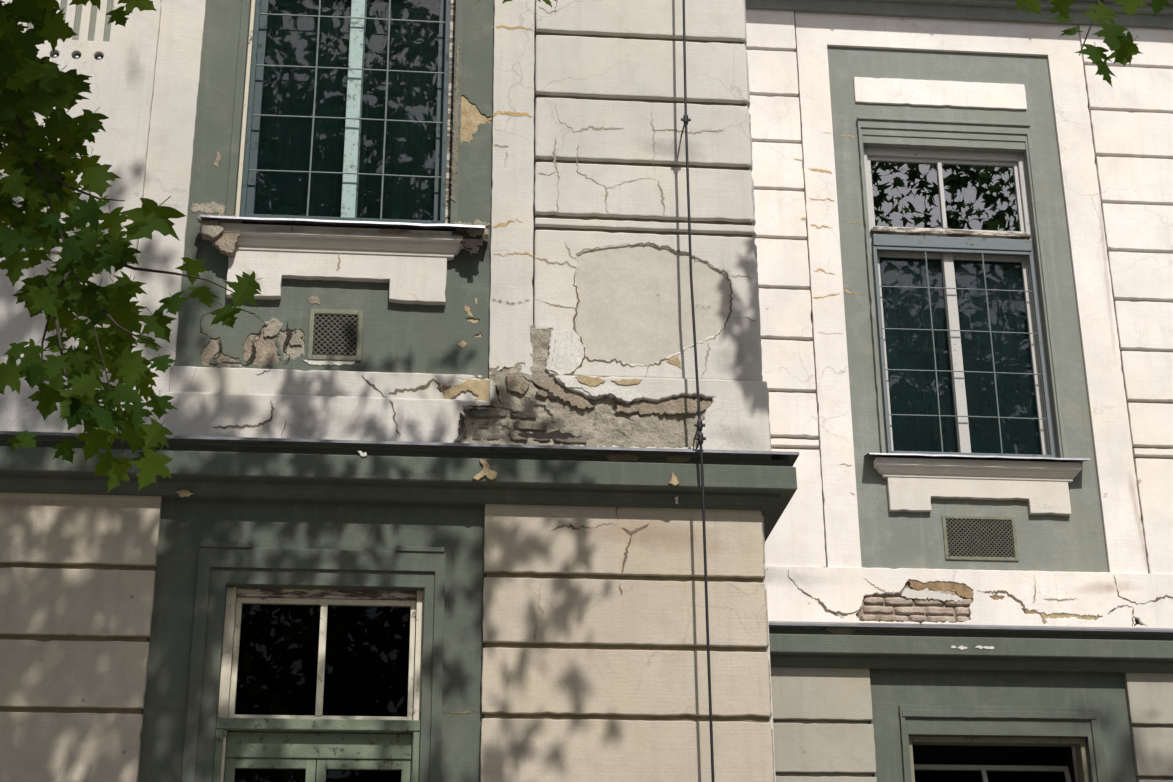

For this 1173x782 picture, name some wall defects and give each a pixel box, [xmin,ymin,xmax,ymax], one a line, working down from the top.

crack [489,104,723,217]
flaking render [190,201,243,257]
crack [493,219,757,378]
flaking render [200,318,355,368]
crack [212,401,286,438]
crack [362,375,444,437]
flaking render [438,325,712,486]
crack [553,501,649,595]
flaking render [825,580,973,635]
crack [977,575,1078,620]
crack [1108,577,1173,626]